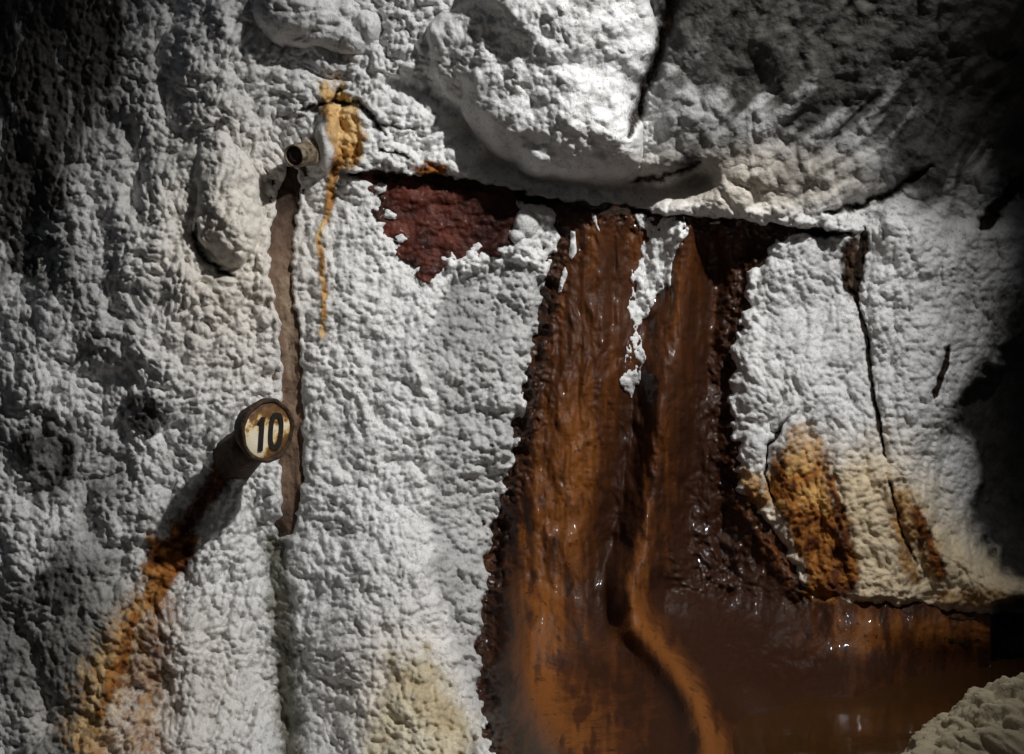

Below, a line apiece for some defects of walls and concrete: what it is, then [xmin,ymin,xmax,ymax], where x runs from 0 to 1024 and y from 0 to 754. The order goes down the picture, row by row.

corrosion [315,76,367,338]
spalling [360,172,520,284]
crack [683,166,930,456]
corrosion [62,465,234,754]
corrosion [474,201,1024,754]